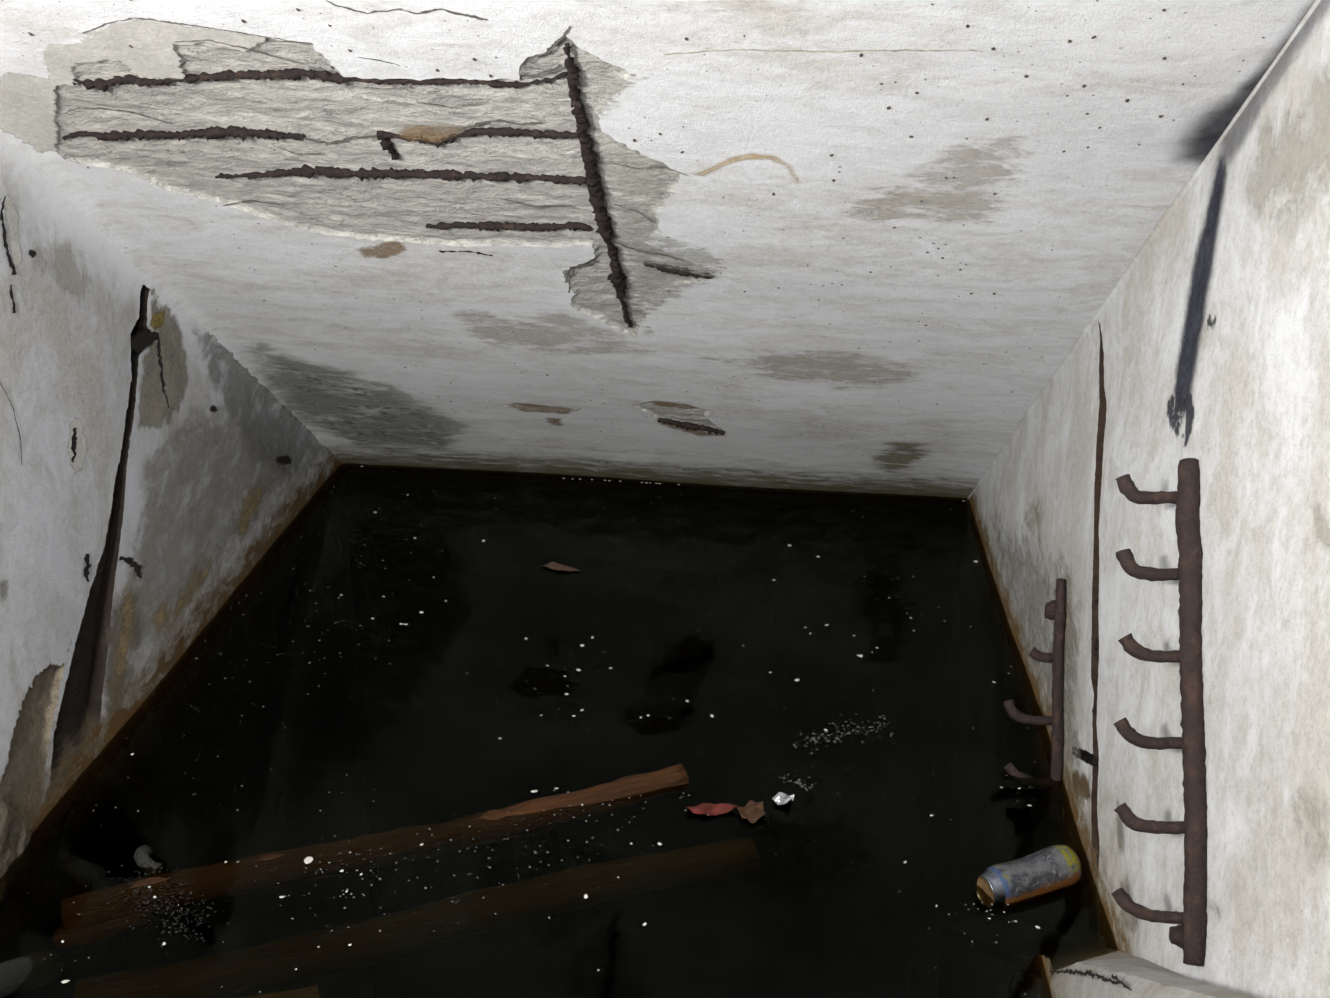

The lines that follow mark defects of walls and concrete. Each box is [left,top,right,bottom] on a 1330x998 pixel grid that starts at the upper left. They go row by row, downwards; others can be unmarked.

rust [62,42,632,328]
spalling [0,18,721,338]
rust [643,260,713,279]
spalling [631,401,727,433]
damp [1167,156,1226,447]
damp [0,334,1137,955]